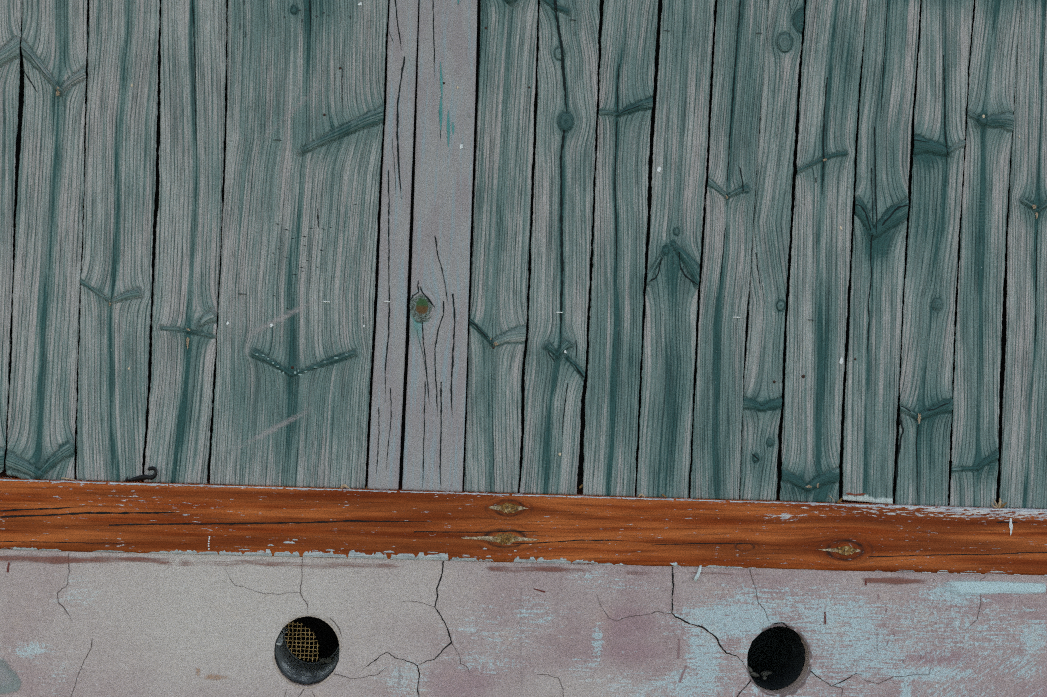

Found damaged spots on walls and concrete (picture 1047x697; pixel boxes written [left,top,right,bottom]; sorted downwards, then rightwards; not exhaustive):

crack [226,558,341,634]
crack [0,507,627,619]
peeling [149,539,493,562]
crack [335,561,470,697]
peeling [508,550,624,565]
crack [599,543,751,697]
crack [750,571,791,628]
crack [810,668,931,697]